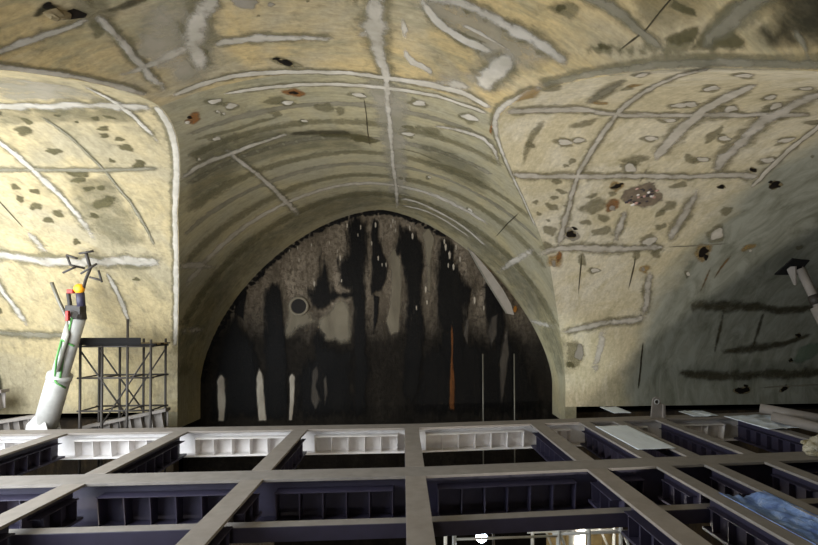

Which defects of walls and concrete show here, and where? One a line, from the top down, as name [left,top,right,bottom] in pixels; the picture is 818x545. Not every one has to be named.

damp [109,0,146,11]
crack [622,0,671,48]
rust [282,89,305,97]
damp [0,20,161,240]
rust [185,112,200,124]
damp [178,0,818,322]
spalling [610,182,662,208]
damp [153,108,174,341]
spalling [696,245,711,262]
damp [396,225,542,420]